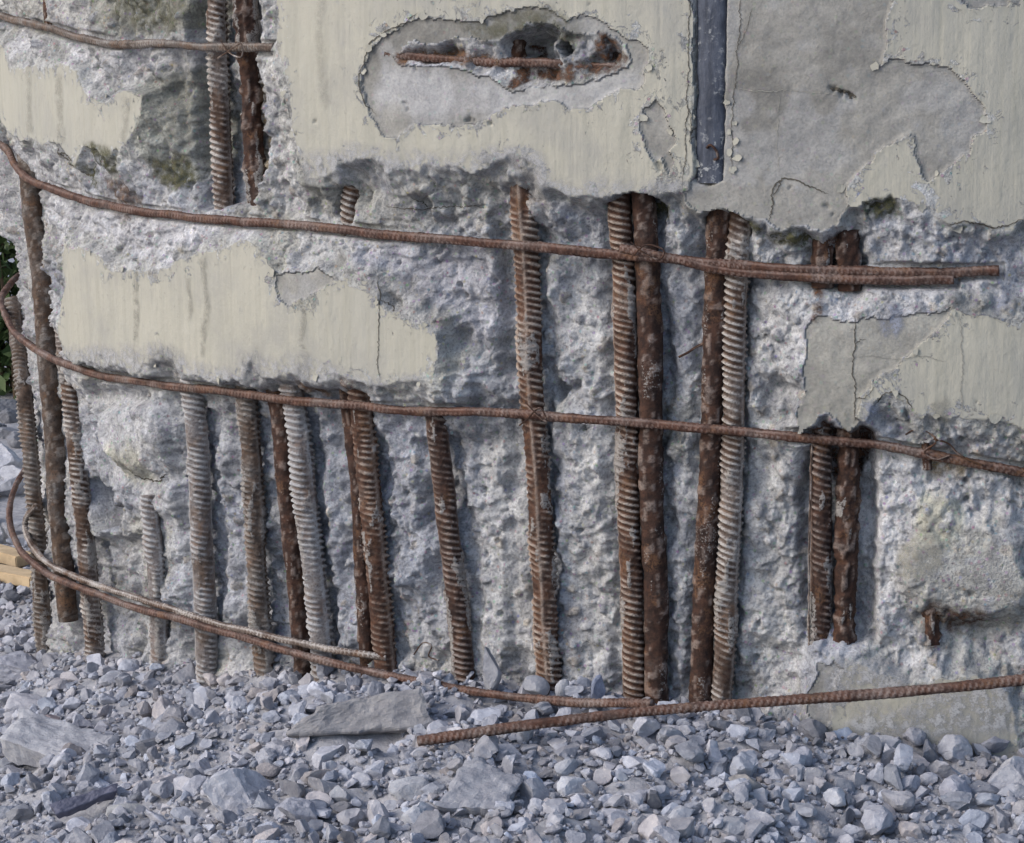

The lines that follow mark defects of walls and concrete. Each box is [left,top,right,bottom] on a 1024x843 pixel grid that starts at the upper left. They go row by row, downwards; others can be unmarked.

corrosion [397,49,499,67]
corrosion [508,33,628,89]
crack [730,0,856,221]
peeling [0,0,1024,468]
crack [377,281,395,377]
crack [851,316,964,419]
spalling [9,332,1024,749]
corrosion [810,421,875,645]
corrosion [921,603,986,646]